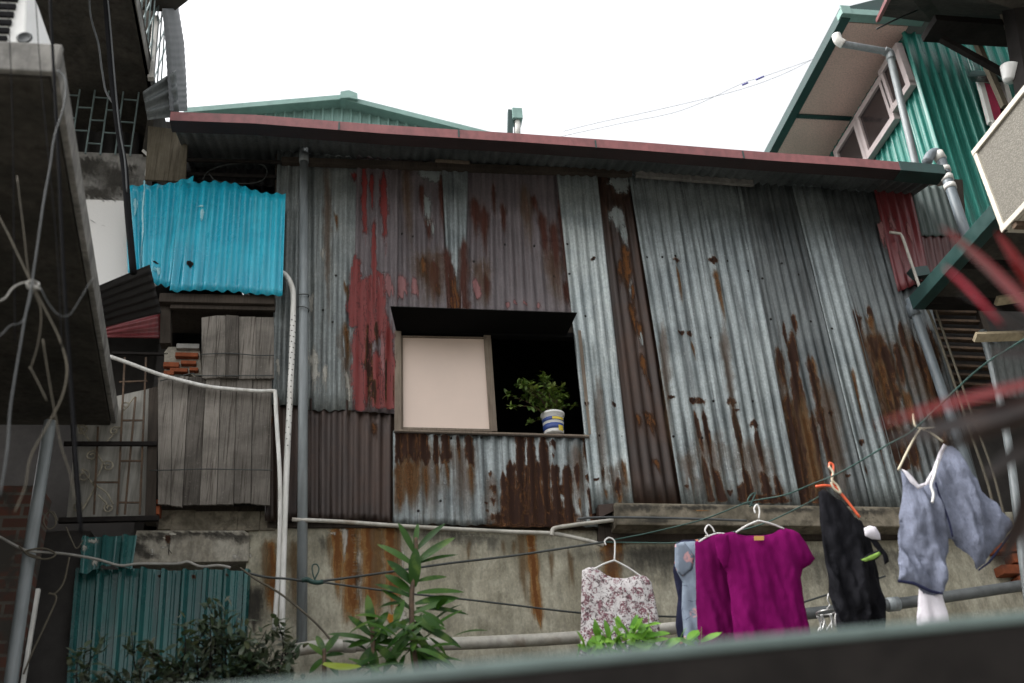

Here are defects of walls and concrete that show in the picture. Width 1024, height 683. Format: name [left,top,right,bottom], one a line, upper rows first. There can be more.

peeling [345,158,419,412]
rust [419,176,444,238]
rust [419,240,470,309]
rust [470,184,506,248]
rust [531,195,570,301]
rust [617,244,652,391]
rust [689,314,835,511]
rust [852,306,943,475]
rust [394,433,475,509]
rust [327,528,401,623]
rust [484,436,628,628]